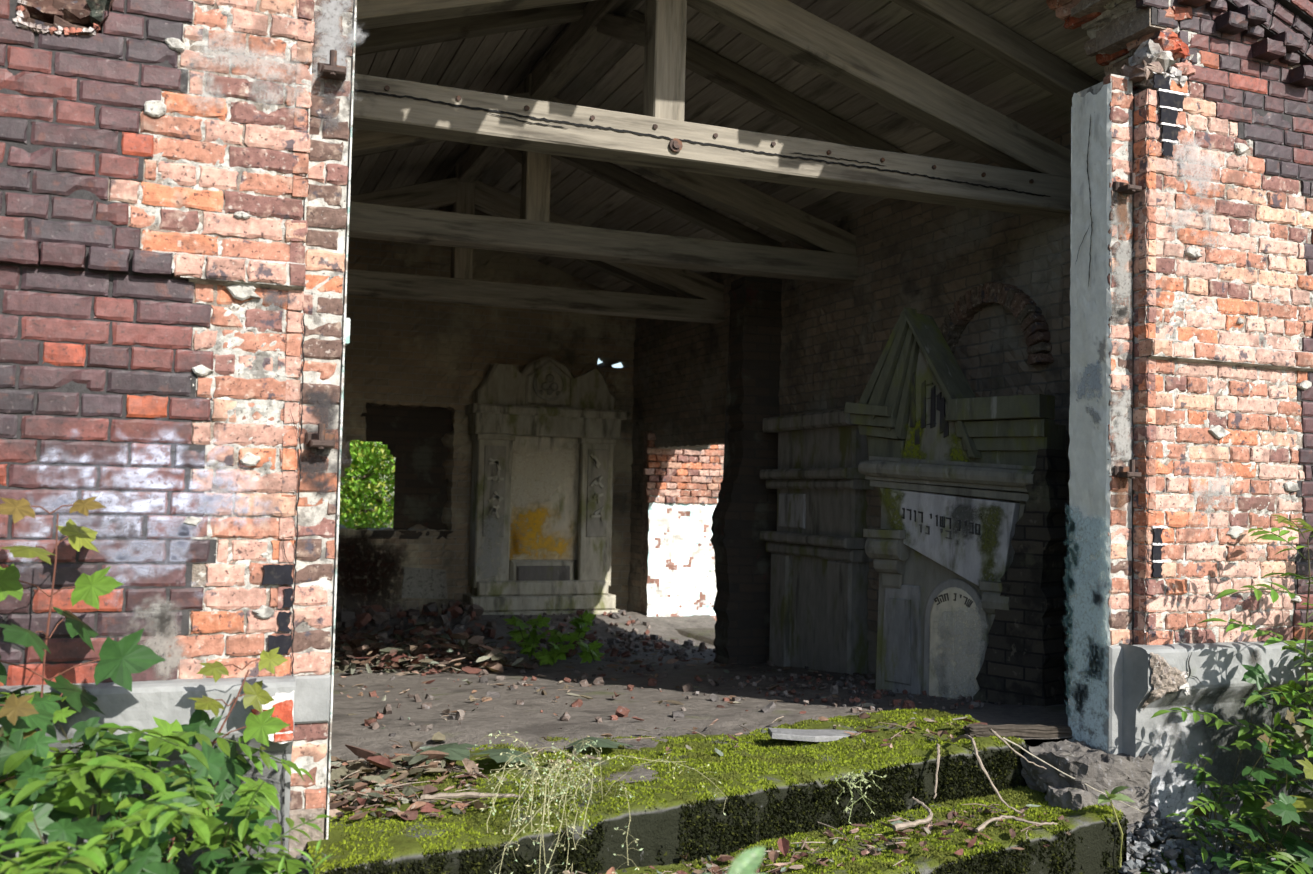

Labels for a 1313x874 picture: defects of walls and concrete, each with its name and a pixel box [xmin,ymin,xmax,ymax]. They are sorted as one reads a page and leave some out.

spalling [13,0,114,36]
peeling [1138,74,1313,710]